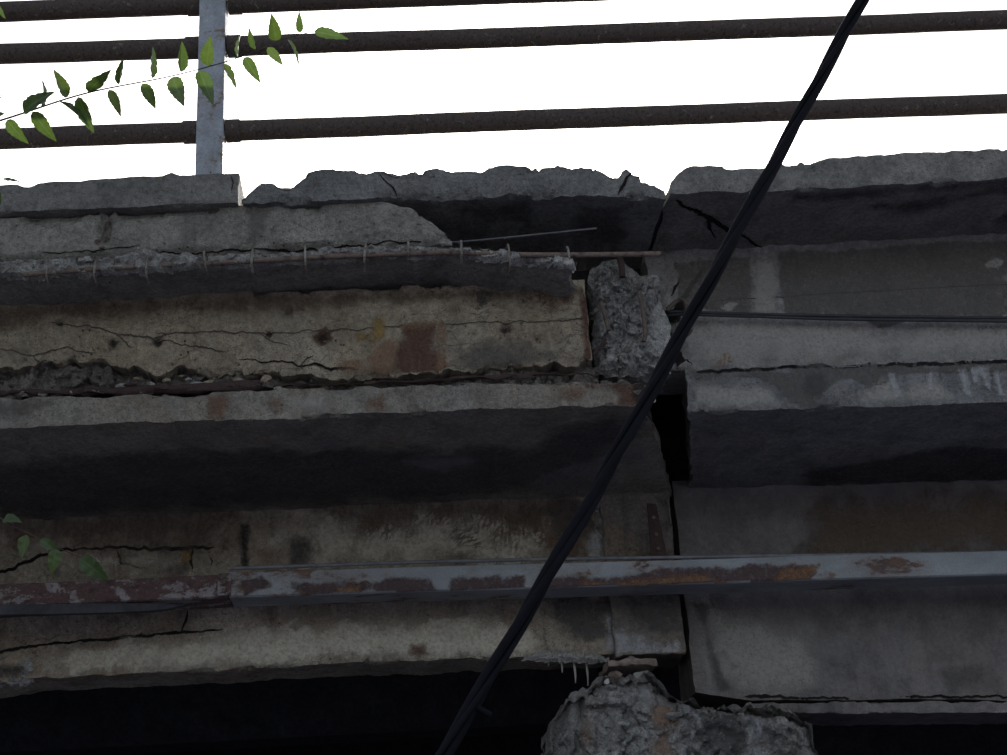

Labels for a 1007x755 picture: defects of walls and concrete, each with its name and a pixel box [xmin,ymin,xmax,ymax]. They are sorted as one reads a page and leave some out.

leakage [704,258,754,312]
leakage [779,241,1007,327]
spalling [0,212,662,410]
crack [0,322,402,371]
corrosion [0,324,598,397]
leakage [741,363,1007,407]
crack [0,545,214,573]
corrosion [292,578,437,595]
corrosion [450,575,525,591]
corrosion [549,563,820,588]
crack [0,610,224,654]
spalling [577,682,804,755]